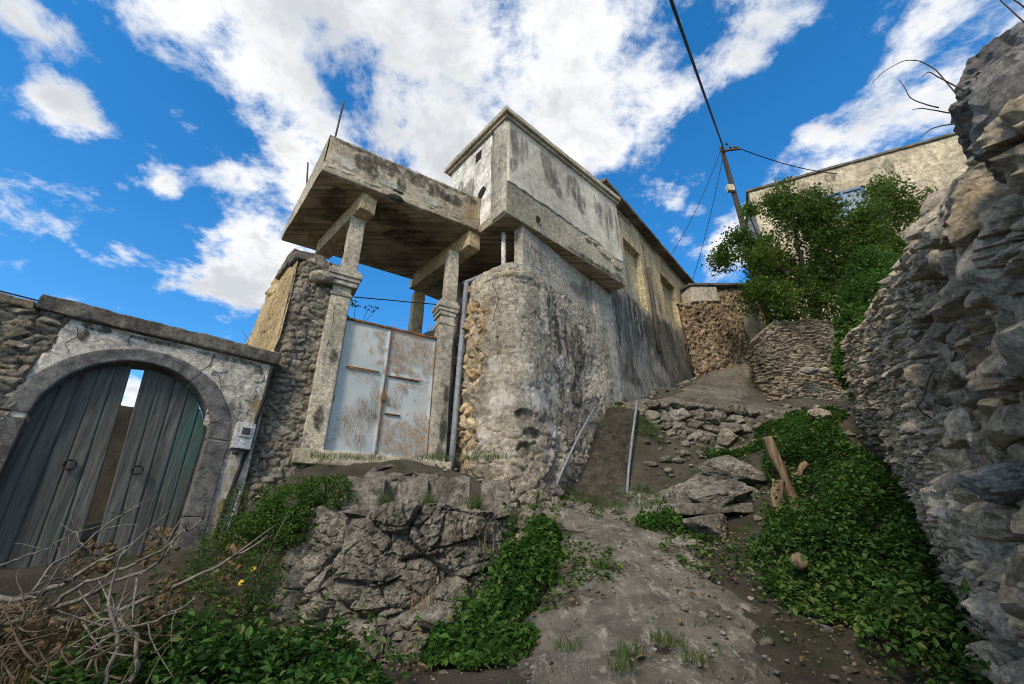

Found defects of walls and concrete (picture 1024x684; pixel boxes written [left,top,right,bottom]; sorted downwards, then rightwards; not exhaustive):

water stain [336,141,477,220]
water stain [510,129,528,170]
water stain [541,152,653,276]
rust [334,326,438,458]
flaking render [450,286,485,473]
water stain [468,429,491,462]
water stain [476,355,502,373]
water stain [487,292,589,466]